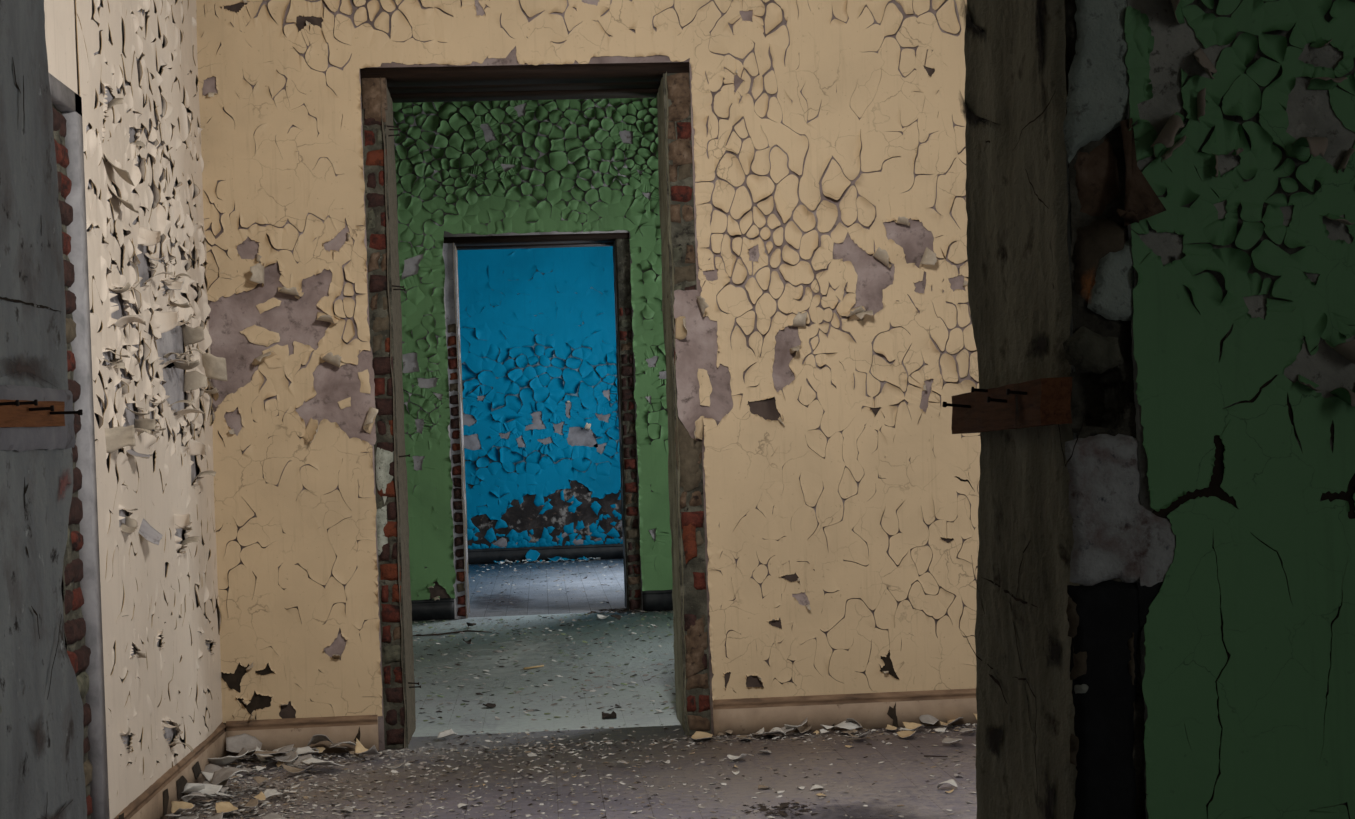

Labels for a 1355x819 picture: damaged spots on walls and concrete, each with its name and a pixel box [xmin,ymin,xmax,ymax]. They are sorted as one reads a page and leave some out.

peeling [221,0,249,13]
peeling [739,10,753,22]
peeling [1286,37,1355,174]
peeling [99,350,130,369]
flaking render [104,70,486,752]
flaking render [494,67,977,740]
flaking render [1063,0,1229,819]
crack [1238,375,1334,442]
crack [1152,435,1238,519]
crack [1321,473,1355,519]
crack [1206,587,1230,819]
crack [1324,589,1343,715]